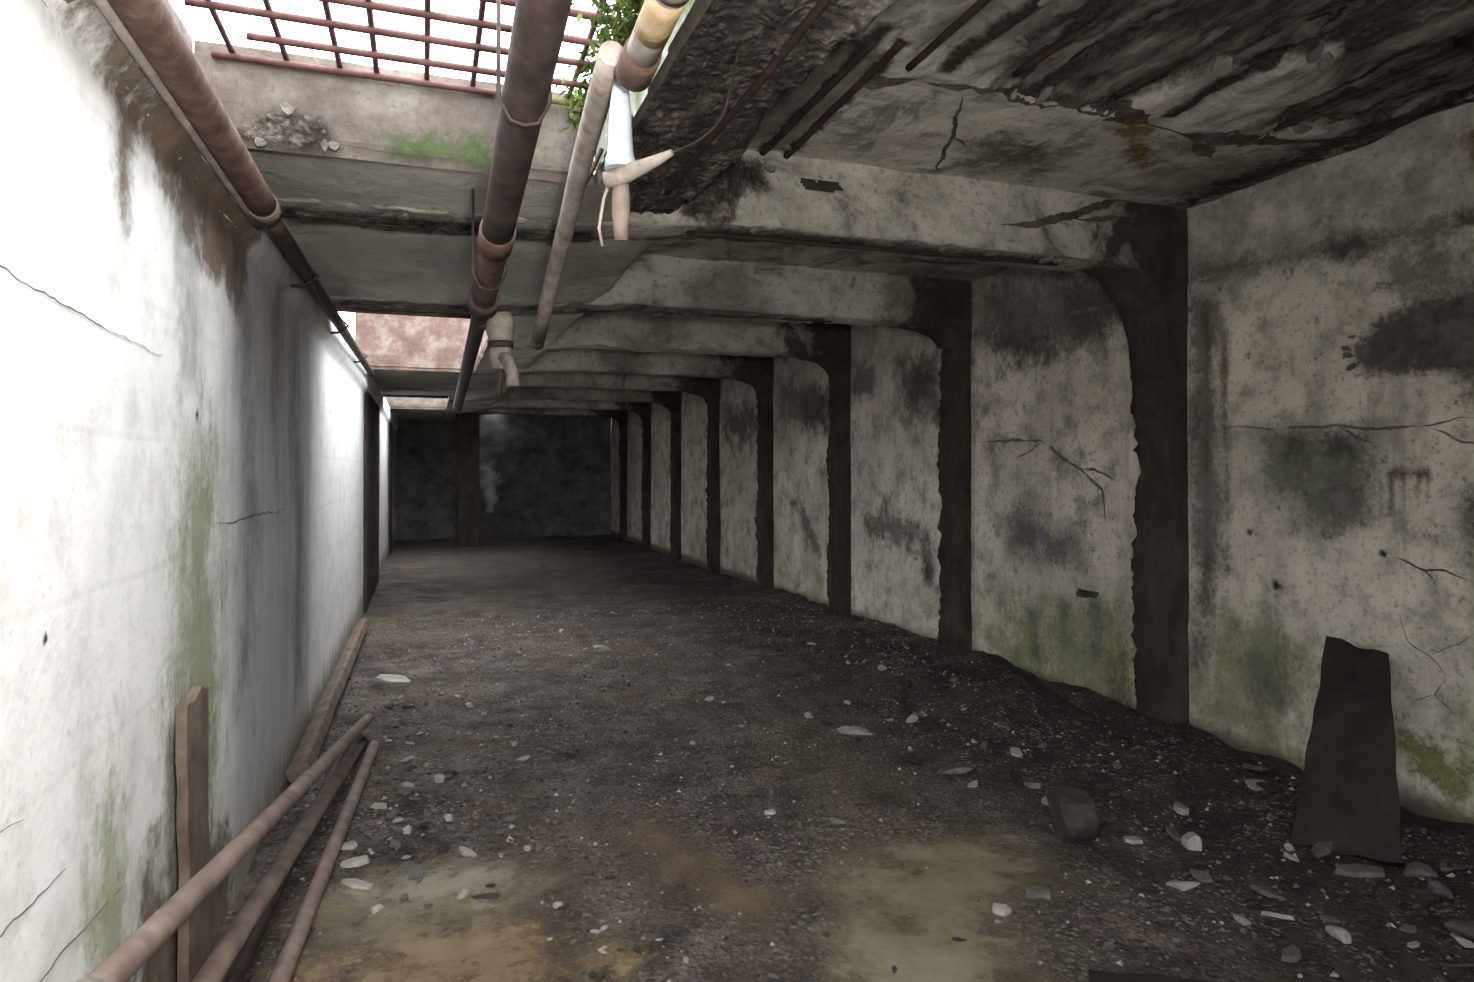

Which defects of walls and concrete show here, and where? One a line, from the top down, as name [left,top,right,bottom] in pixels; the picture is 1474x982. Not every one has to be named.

peeling [595,107,610,169]
spalling [629,0,1474,266]
crack [863,75,1357,174]
damp [1297,211,1474,305]
crack [0,265,158,355]
crack [977,438,1114,546]
damp [1261,424,1383,528]
crack [1215,417,1474,444]
damp [175,452,231,860]
damp [141,728,179,922]
crack [0,868,66,938]
damp [134,929,178,982]